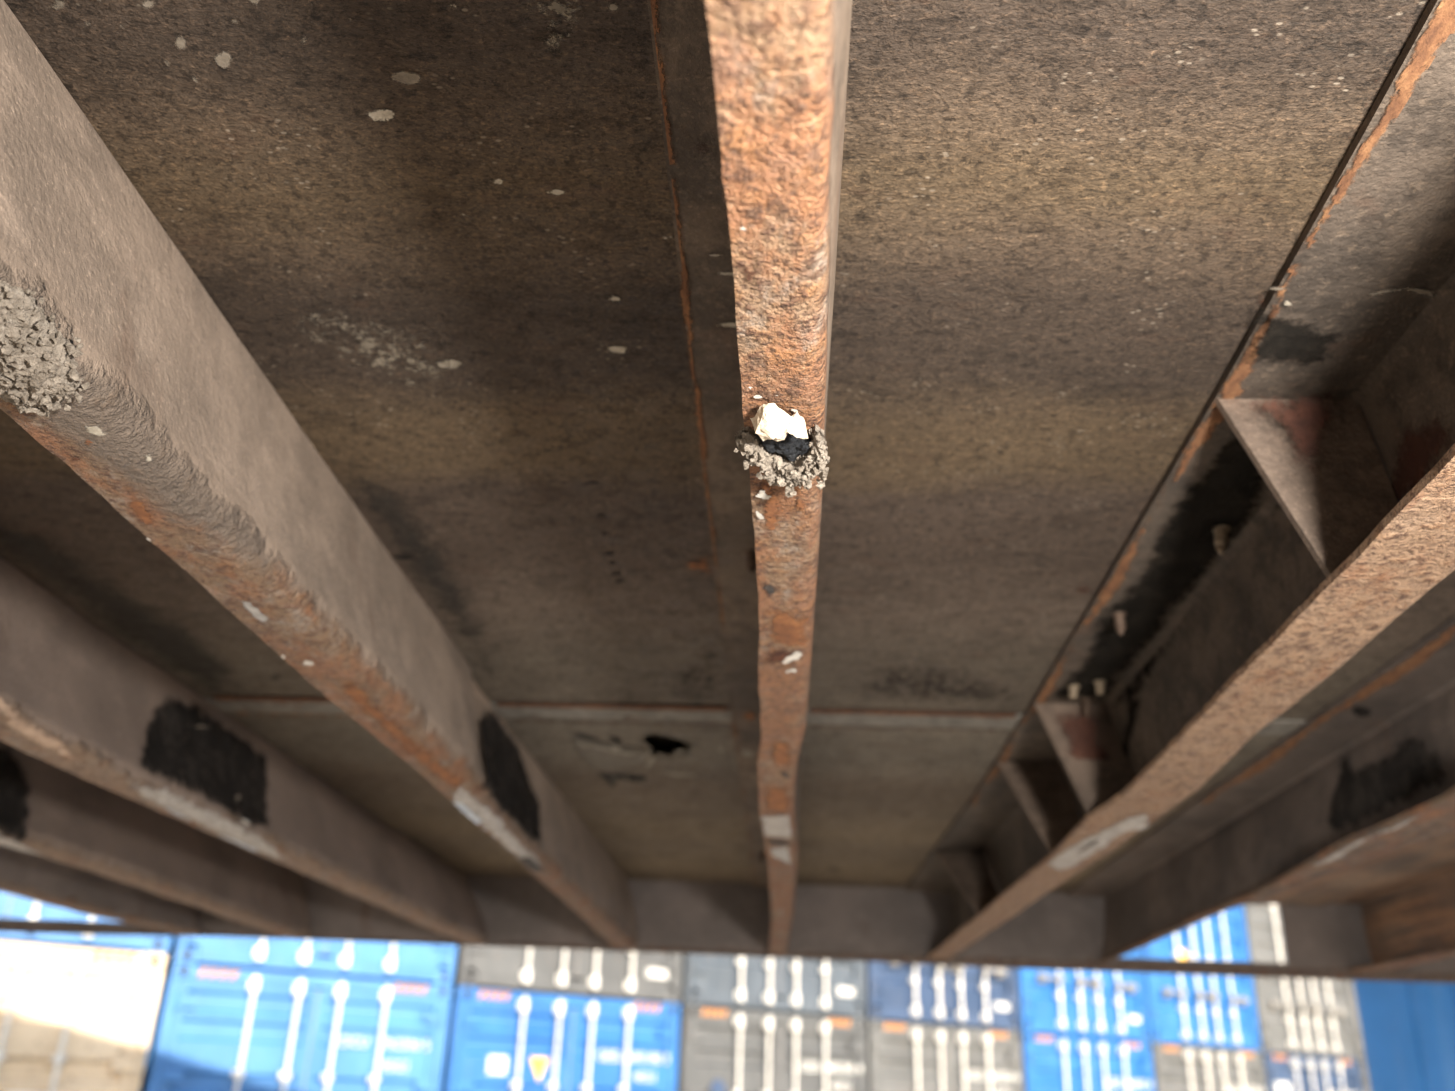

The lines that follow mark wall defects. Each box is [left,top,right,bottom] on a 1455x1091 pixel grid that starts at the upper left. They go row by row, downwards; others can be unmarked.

rust [1307,0,1455,247]
rust [650,0,725,631]
rust [761,485,808,530]
rust [810,265,1297,805]
rust [1391,418,1449,501]
peeling [573,738,698,787]
rust [765,651,792,664]
rust [1201,626,1455,804]